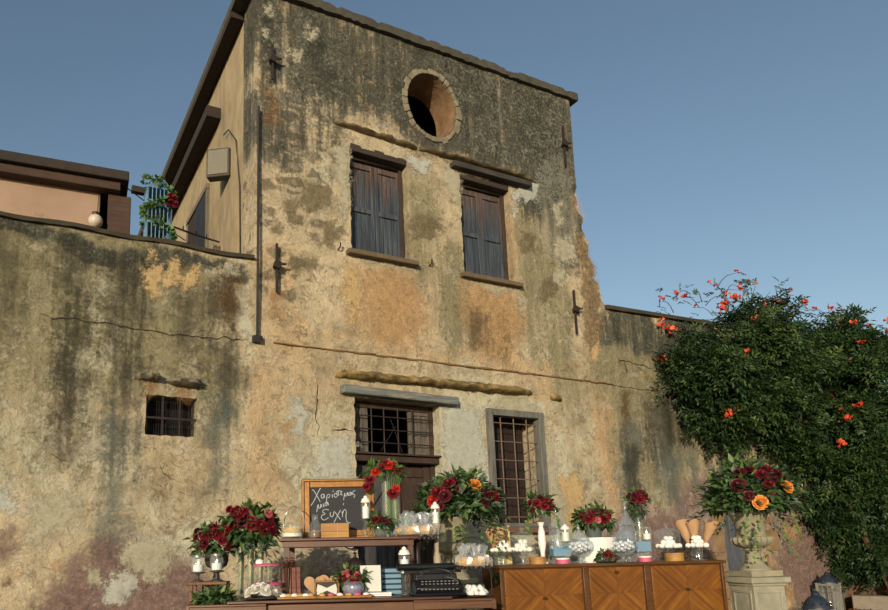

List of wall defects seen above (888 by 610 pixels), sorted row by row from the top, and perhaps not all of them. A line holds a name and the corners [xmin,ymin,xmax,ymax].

flaking render [443,168,463,207]
flaking render [512,182,540,218]
spalling [540,202,605,361]
water stain [106,252,142,455]
crack [44,314,245,341]
crack [608,357,663,392]
water stain [621,392,639,490]
water stain [645,394,678,465]
flaking render [34,535,207,610]